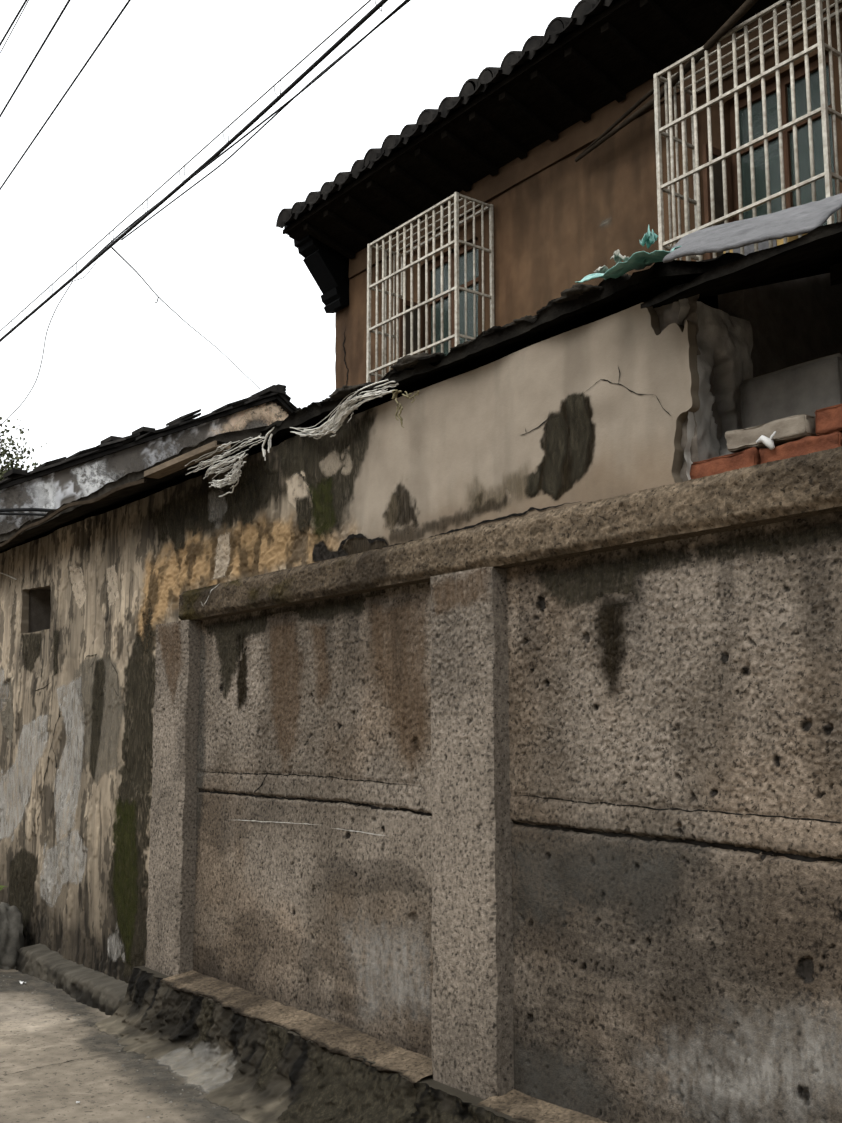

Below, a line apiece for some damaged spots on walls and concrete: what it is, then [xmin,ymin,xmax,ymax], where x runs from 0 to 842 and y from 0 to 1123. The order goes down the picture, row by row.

crack [583,367,671,416]
peeling [212,403,288,434]
water stain [475,393,595,508]
peeling [33,482,54,519]
peeling [72,461,120,496]
water stain [69,566,87,609]
water stain [107,565,119,606]
water stain [22,631,59,675]
water stain [89,660,105,779]
water stain [195,589,405,867]
water stain [108,608,156,983]